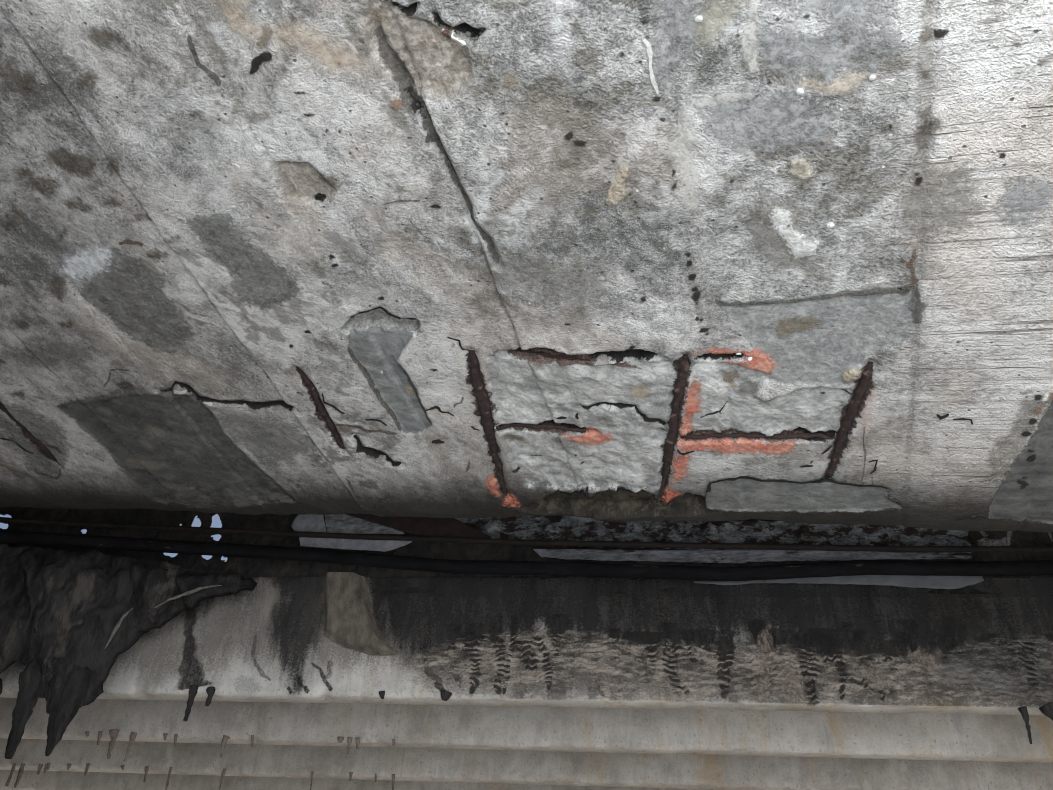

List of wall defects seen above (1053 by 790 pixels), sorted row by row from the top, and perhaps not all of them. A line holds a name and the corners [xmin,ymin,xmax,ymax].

crack [375,26,499,262]
rust [508,347,640,369]
rust [708,348,773,374]
crack [160,381,401,467]
crack [426,397,479,431]
rust [468,350,612,507]
spalling [486,350,851,517]
rust [659,353,873,504]
leakage [411,631,1053,706]